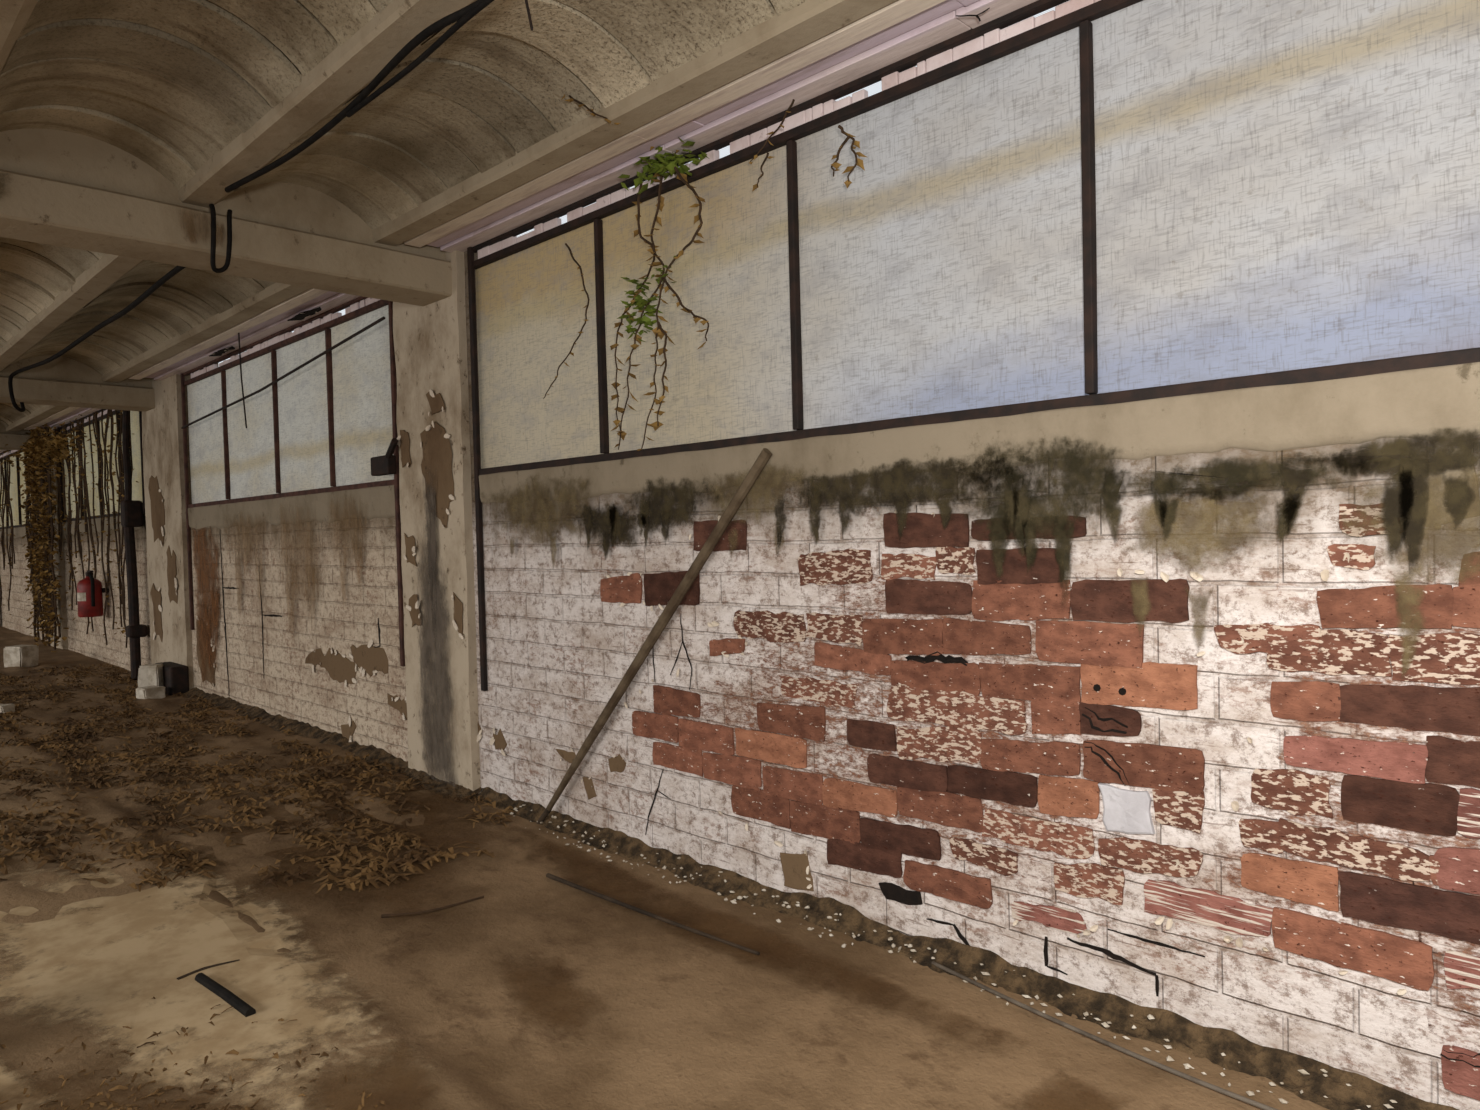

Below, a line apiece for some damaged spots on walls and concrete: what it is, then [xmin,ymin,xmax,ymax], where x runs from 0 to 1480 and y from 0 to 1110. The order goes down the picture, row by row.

peeling [397,389,455,528]
leakage [494,428,1480,673]
peeling [196,616,217,687]
leakage [0,487,477,1110]
peeling [305,640,389,687]
peeling [387,693,407,720]
peeling [510,447,1480,1104]